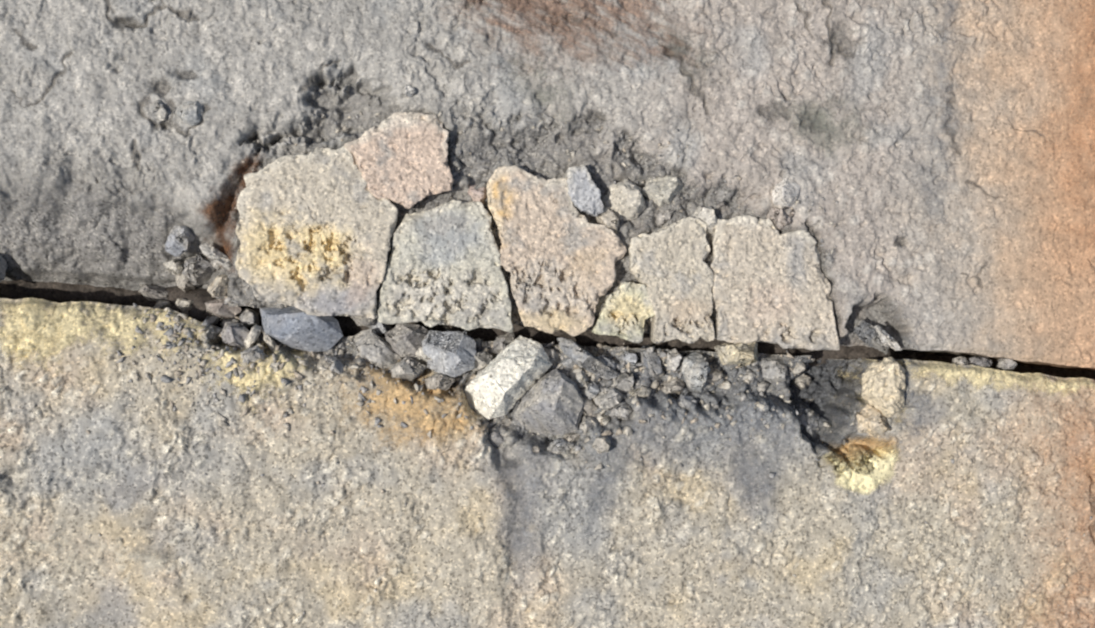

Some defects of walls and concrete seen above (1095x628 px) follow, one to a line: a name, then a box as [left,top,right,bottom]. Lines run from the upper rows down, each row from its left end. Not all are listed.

spalling [0,180,212,290]
spalling [218,110,911,421]
spalling [487,391,530,445]